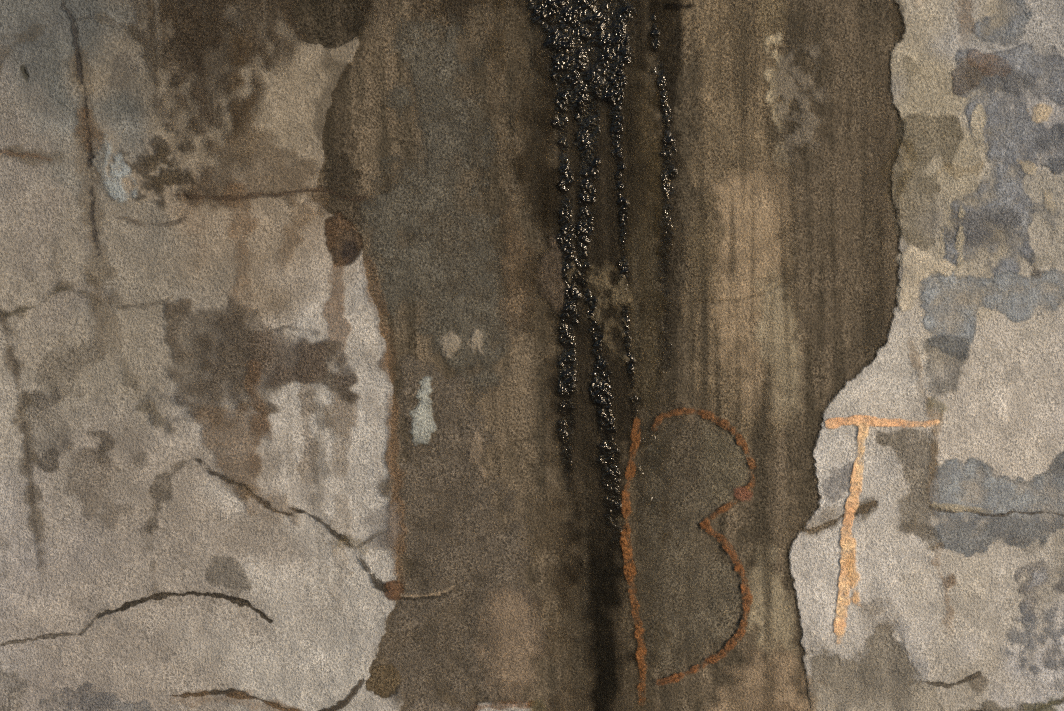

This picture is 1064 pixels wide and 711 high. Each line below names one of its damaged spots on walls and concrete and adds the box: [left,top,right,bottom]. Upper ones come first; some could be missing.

leakage [135,0,219,85]
leakage [235,0,312,64]
leakage [325,0,370,46]
crack [62,0,100,256]
leakage [362,0,823,711]
leakage [165,299,358,499]
crack [147,473,170,529]
crack [197,459,446,600]
crack [1,591,273,646]
crack [172,680,364,711]